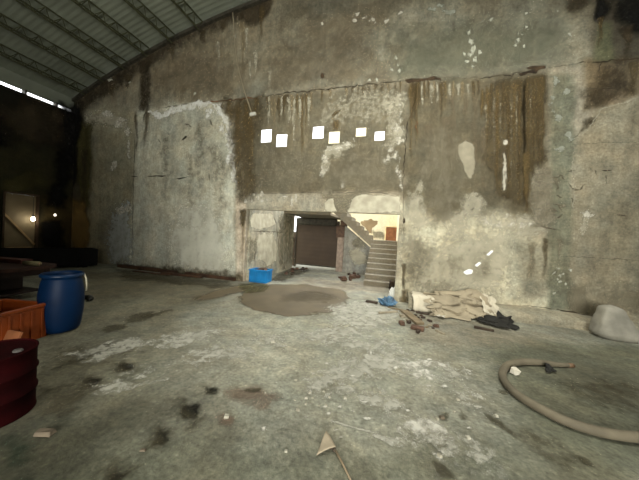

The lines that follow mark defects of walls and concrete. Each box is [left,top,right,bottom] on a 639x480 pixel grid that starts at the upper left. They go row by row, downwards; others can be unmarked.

water stain [76,0,272,109]
water stain [148,100,237,185]
corrosion [222,95,307,202]
crack [165,78,421,178]
water stain [319,90,405,212]
corrosion [409,81,454,120]
peeling [458,141,475,178]
corrosion [472,75,547,205]
water stain [566,0,588,12]
water stain [583,62,639,108]
water stain [594,0,639,51]
water stain [171,207,225,275]